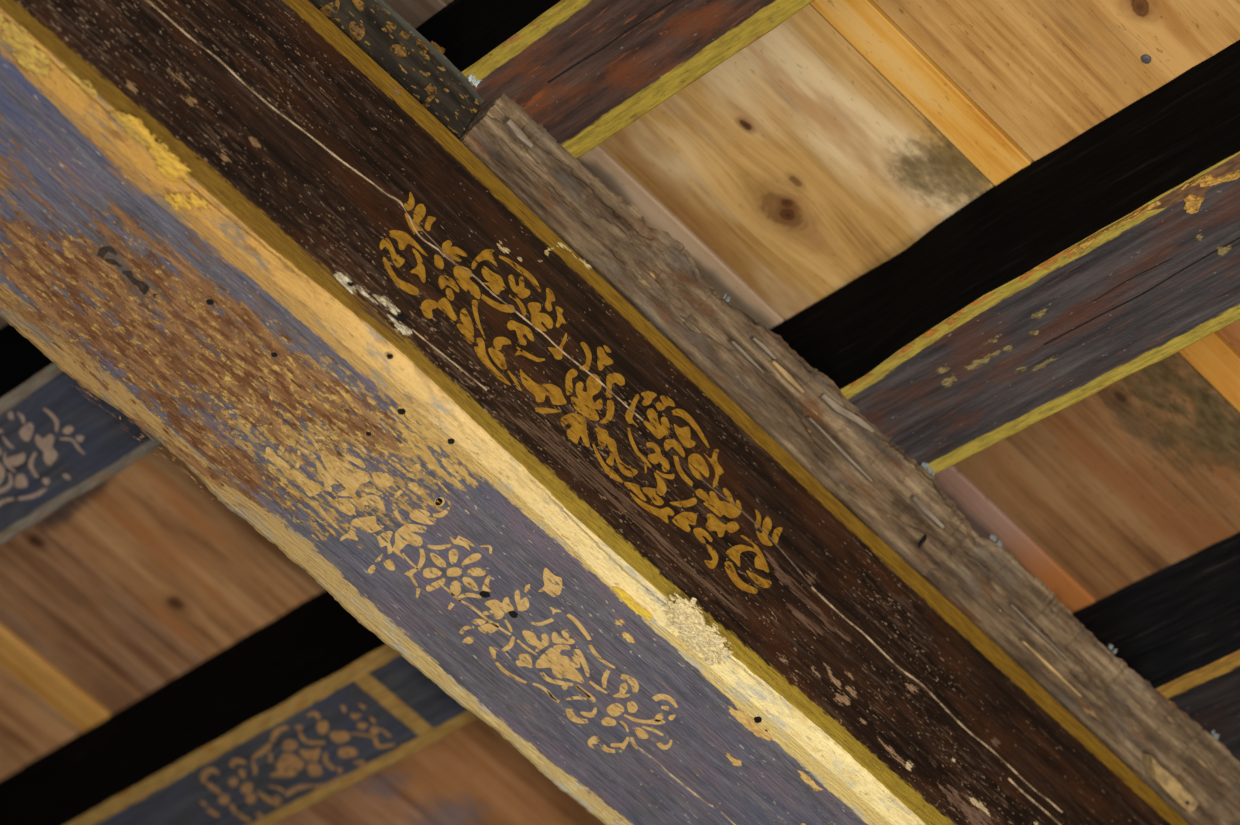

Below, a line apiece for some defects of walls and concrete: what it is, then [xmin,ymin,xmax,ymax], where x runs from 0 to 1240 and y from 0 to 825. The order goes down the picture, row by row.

peeling [0,13,98,95]
peeling [166,68,198,107]
crack [547,0,677,84]
peeling [110,110,208,213]
crack [146,0,643,421]
leakage [900,136,986,202]
peeling [0,138,483,555]
spalling [613,586,733,666]
crack [701,478,1062,825]
crack [626,738,736,825]